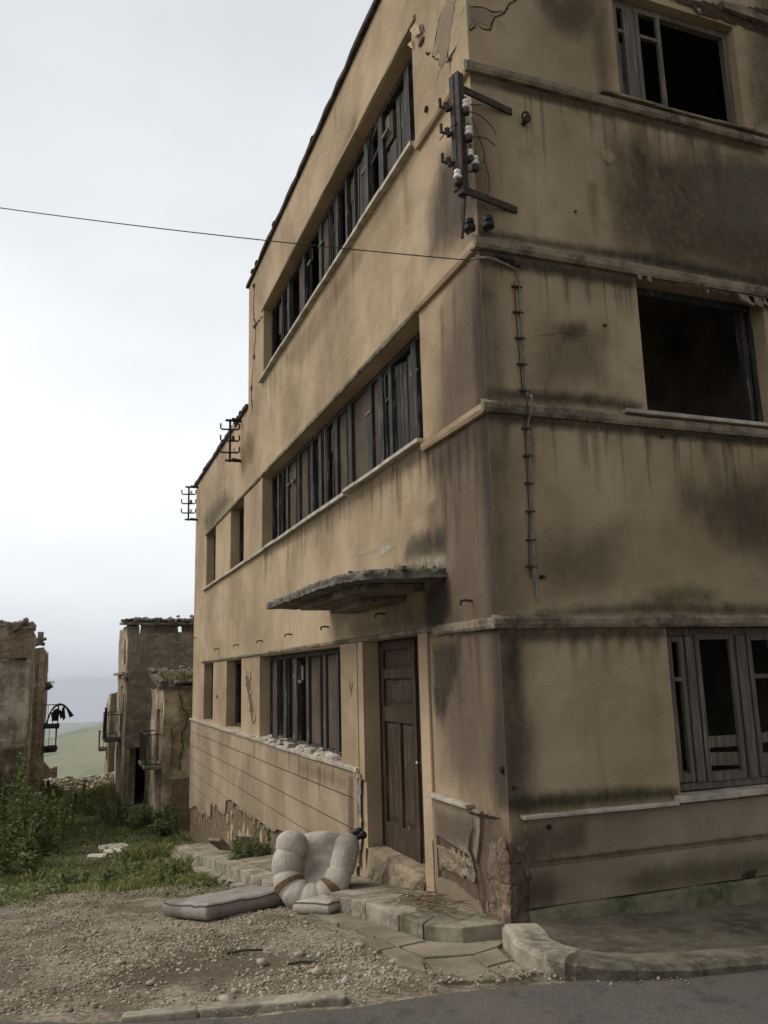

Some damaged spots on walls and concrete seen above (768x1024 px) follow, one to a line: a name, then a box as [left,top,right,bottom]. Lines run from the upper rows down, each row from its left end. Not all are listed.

peeling [407,0,456,67]
spalling [677,0,768,36]
damp [587,148,768,284]
damp [416,251,768,782]
spalling [170,778,283,853]
spalling [437,837,530,927]